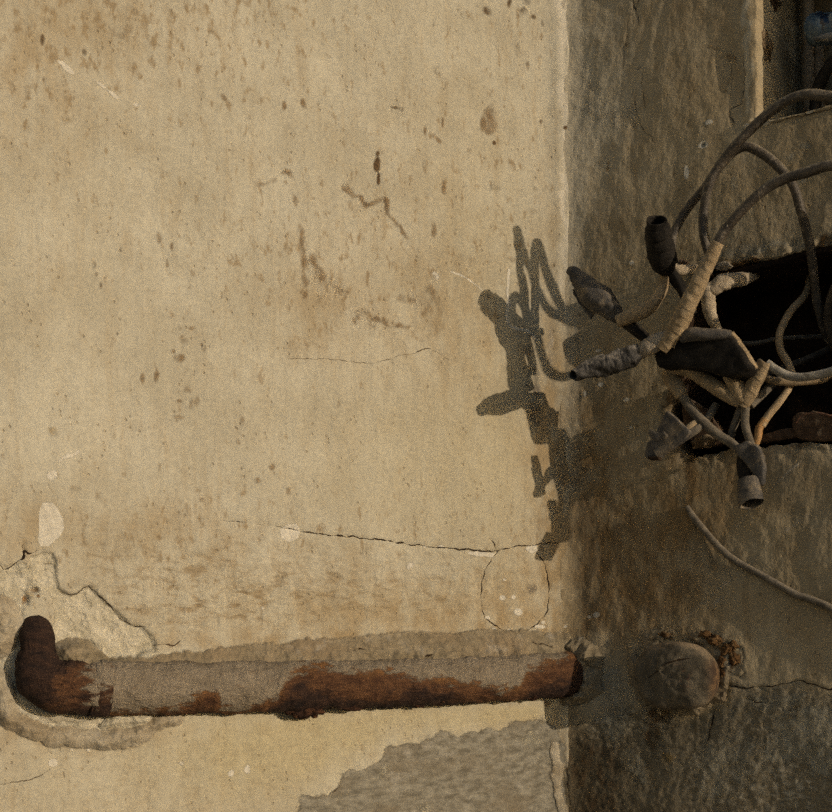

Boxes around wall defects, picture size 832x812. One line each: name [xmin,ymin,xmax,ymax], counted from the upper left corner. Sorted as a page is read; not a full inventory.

flaking render [0,502,155,659]
crack [228,521,560,647]
flaking render [0,644,108,731]
corrosion [694,630,741,680]
crack [729,647,832,703]
peeling [298,718,568,812]